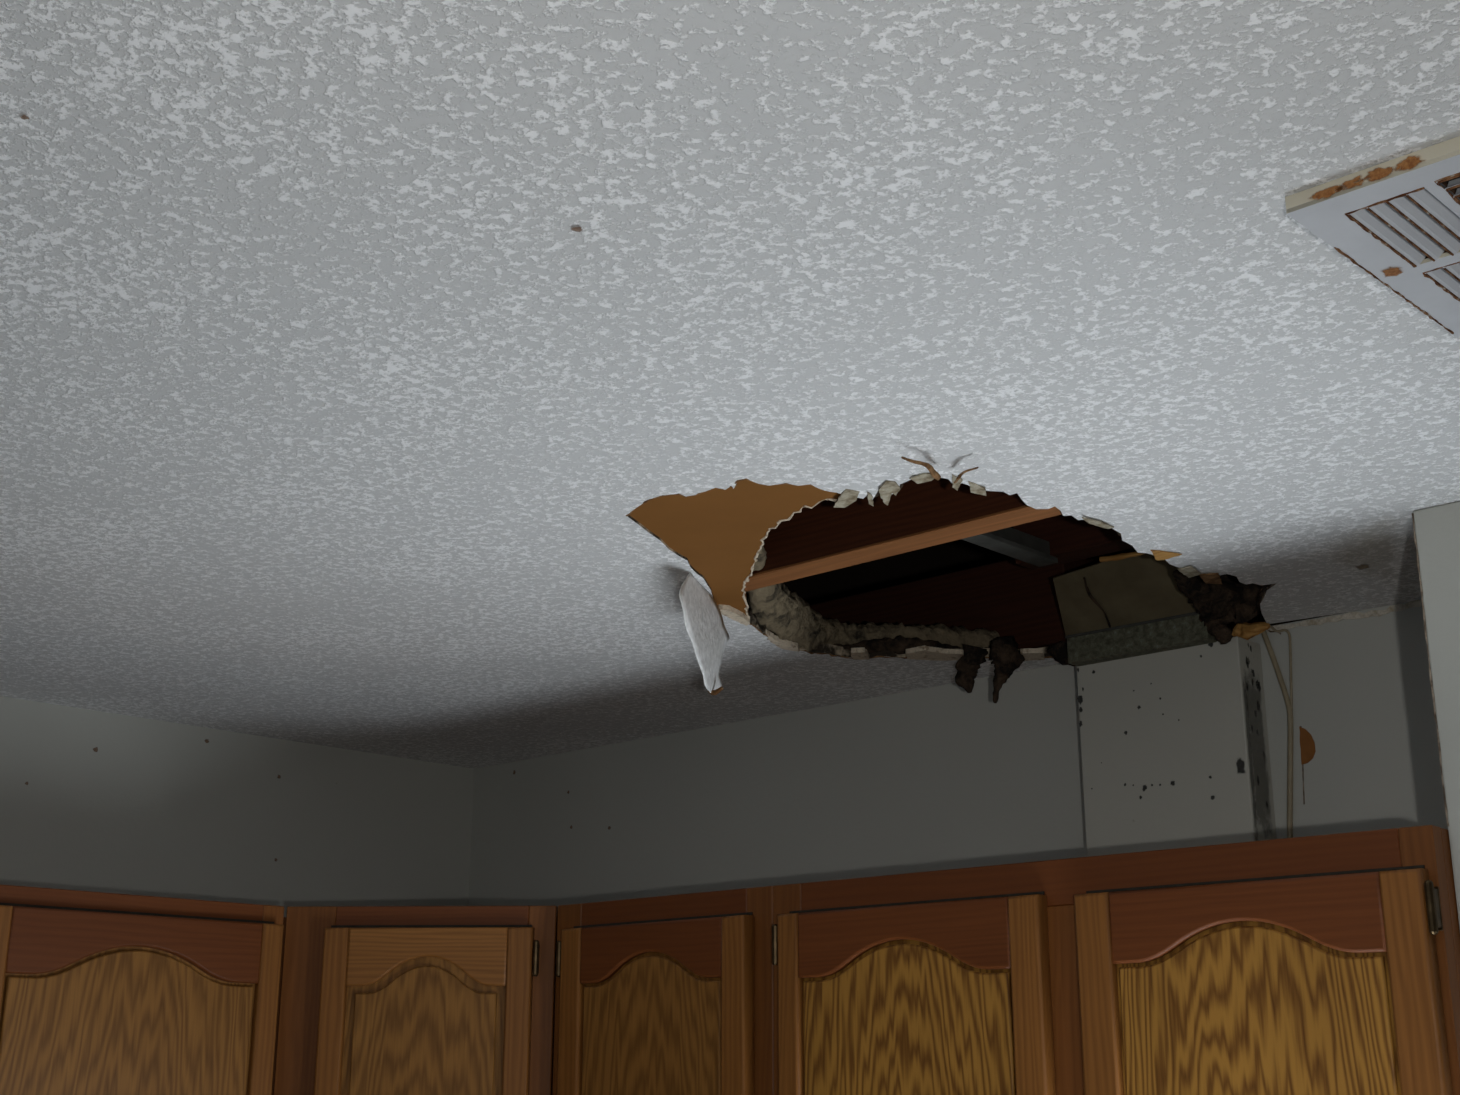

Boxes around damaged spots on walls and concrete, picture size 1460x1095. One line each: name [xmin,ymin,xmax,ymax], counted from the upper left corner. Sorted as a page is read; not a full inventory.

corrosion [1310,156,1424,199]
corrosion [1334,173,1460,334]
peeling [626,478,841,695]
peeling [851,647,869,660]
peeling [906,645,964,661]
peeling [1020,648,1044,661]
damp [1236,643,1271,832]